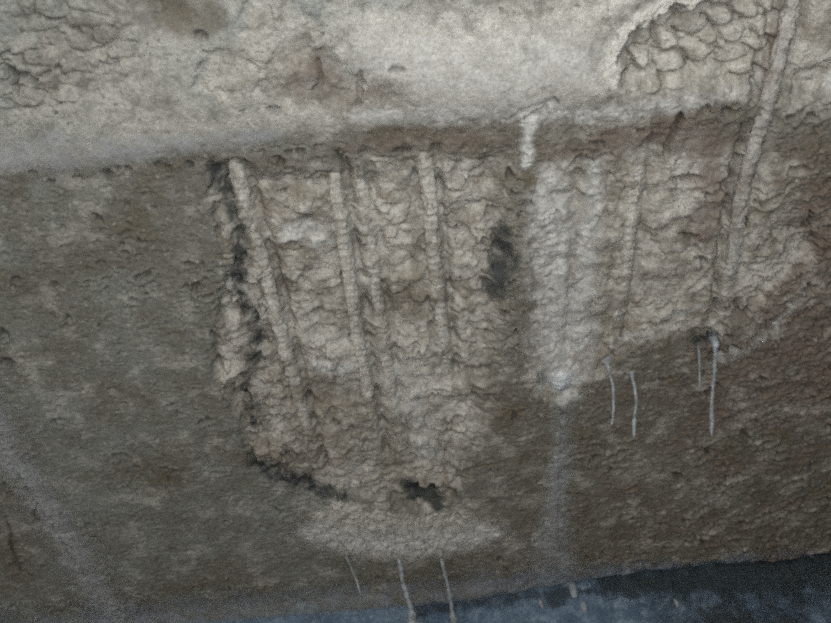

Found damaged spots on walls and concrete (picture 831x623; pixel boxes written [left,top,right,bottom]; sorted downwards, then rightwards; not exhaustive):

spalling [191,0,831,517]
leakage [349,29,729,407]
leakage [413,520,630,616]